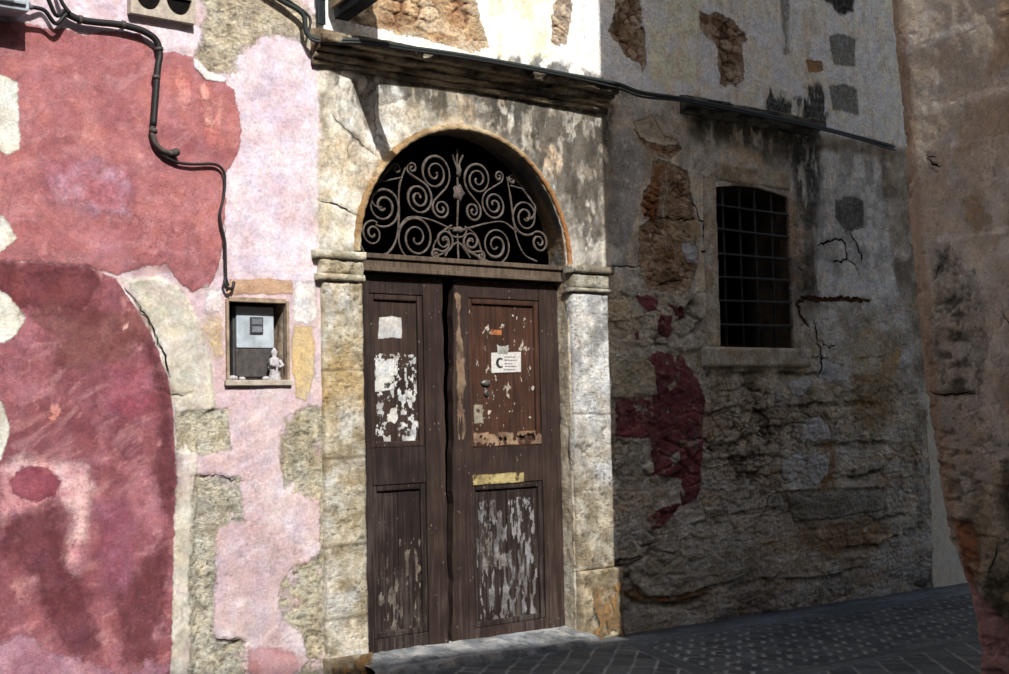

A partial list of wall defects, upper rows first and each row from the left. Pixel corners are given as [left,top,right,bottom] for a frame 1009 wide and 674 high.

spalling [350,0,489,53]
spalling [551,0,573,46]
spalling [608,0,647,72]
spalling [699,11,747,87]
crack [332,96,414,156]
water stain [766,83,829,121]
spalling [633,129,699,337]
water stain [691,116,820,304]
peeling [0,0,326,674]
crack [796,234,870,375]
peeling [615,351,705,530]